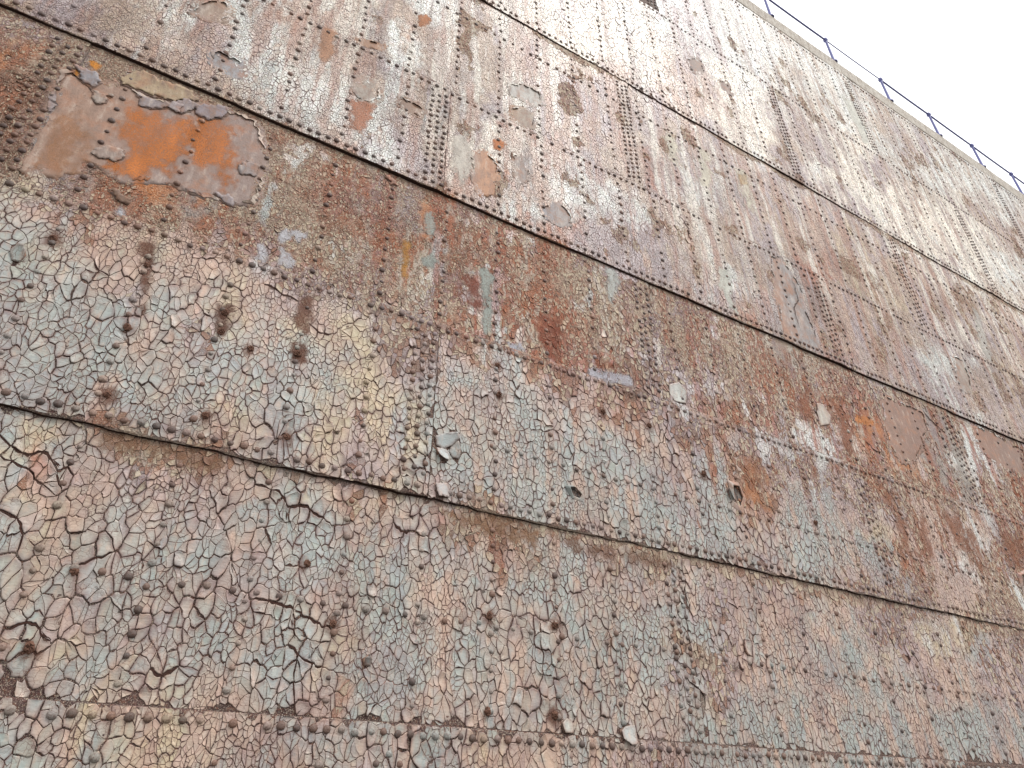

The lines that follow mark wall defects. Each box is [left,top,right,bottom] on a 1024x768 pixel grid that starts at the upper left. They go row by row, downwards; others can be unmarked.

corrosion [74,61,260,208]
peeling [2,0,1024,442]
crack [0,436,72,487]
peeling [879,393,929,466]
peeling [971,425,1024,477]
crack [1,510,23,548]
crack [256,485,332,526]
crack [79,552,113,565]
crack [5,621,50,641]
crack [150,666,179,677]
crack [256,598,331,716]